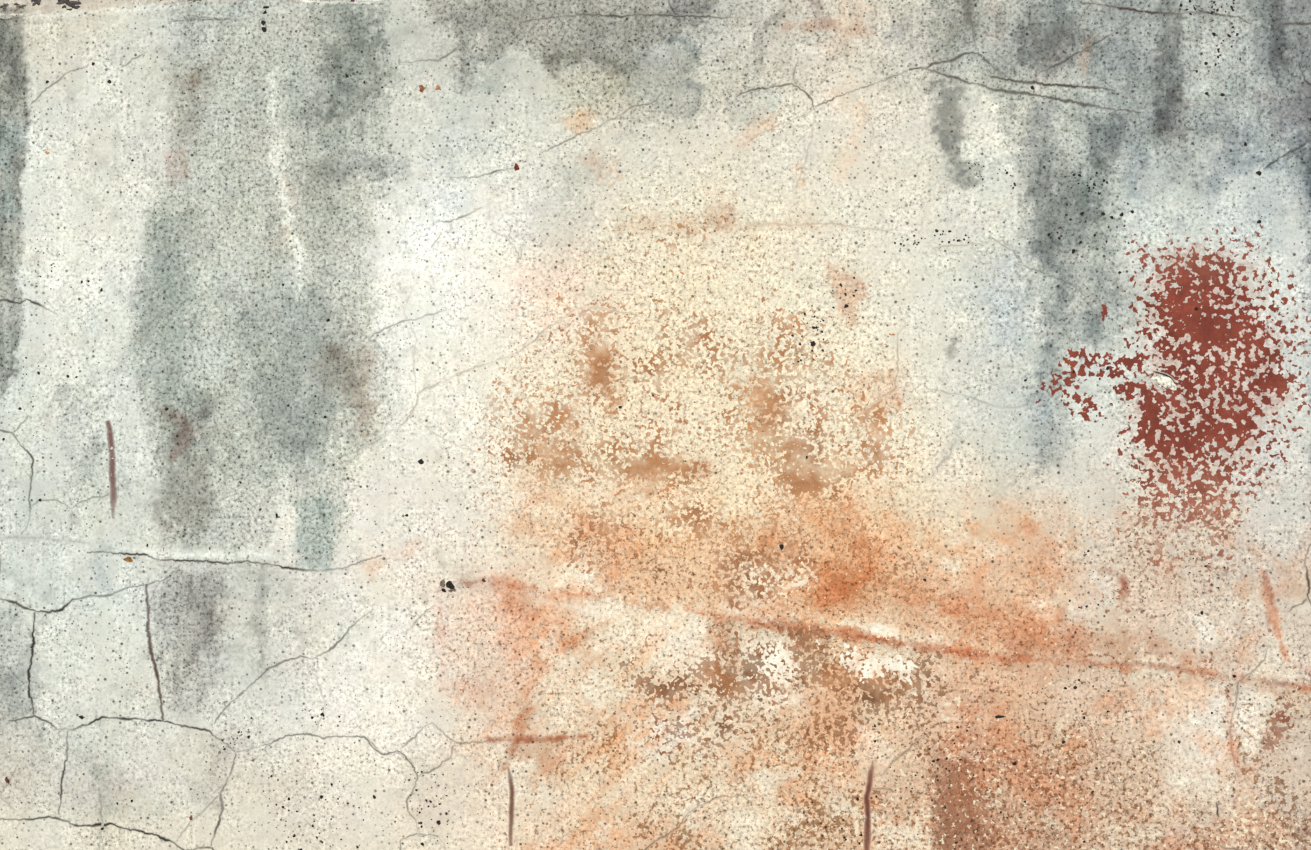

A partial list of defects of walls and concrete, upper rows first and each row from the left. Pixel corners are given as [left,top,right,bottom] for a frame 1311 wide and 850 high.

water stain [0,16,37,405]
crack [0,298,58,315]
water stain [37,364,113,516]
water stain [72,1,417,727]
crack [0,415,497,850]
crack [329,290,652,461]
crack [643,794,743,850]
rust [359,0,1311,850]
water stain [400,0,1311,517]